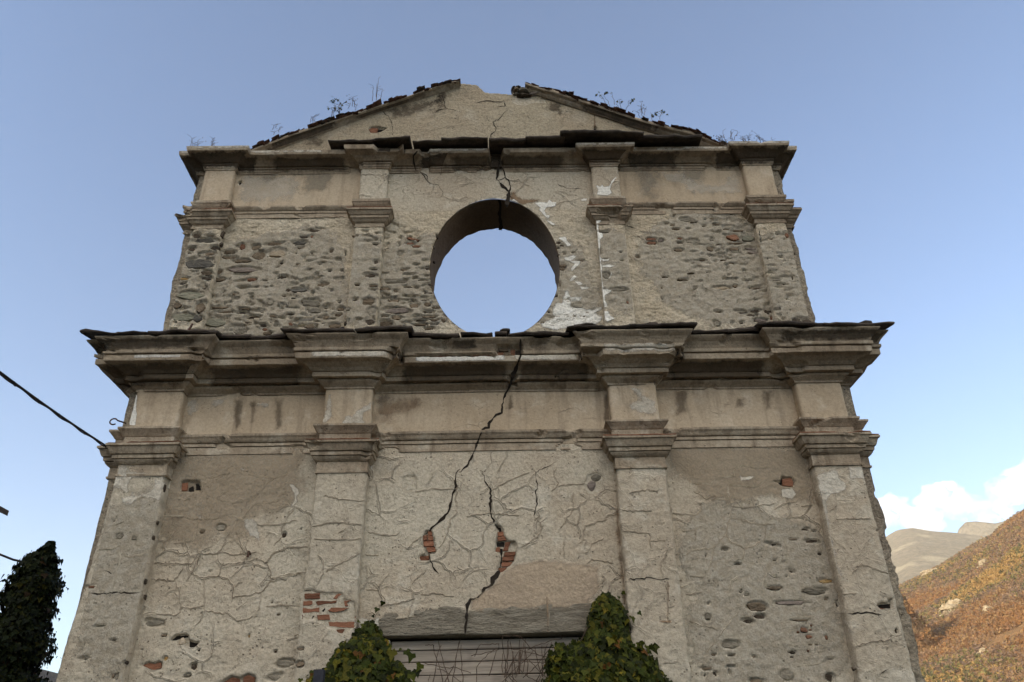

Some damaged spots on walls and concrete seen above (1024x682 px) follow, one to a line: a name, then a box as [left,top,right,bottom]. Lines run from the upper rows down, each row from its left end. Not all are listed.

crack [395,85,523,230]
spalling [538,213,811,327]
crack [92,339,870,664]
spalling [419,530,436,561]
spalling [494,524,517,572]
spalling [299,589,356,635]
crack [841,563,892,647]